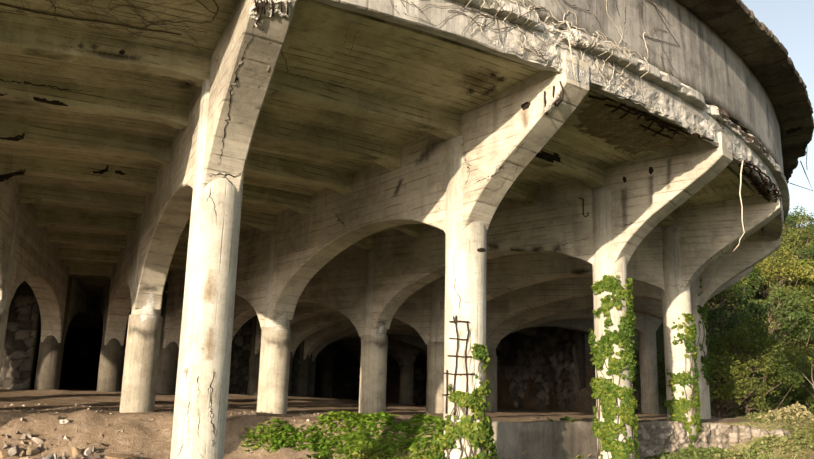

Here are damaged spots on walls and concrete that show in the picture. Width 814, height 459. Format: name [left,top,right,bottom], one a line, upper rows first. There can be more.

spalling [249,0,291,27]
crack [0,79,91,92]
spalling [33,97,68,106]
crack [207,26,254,222]
spalling [486,37,787,203]
spalling [0,169,26,182]